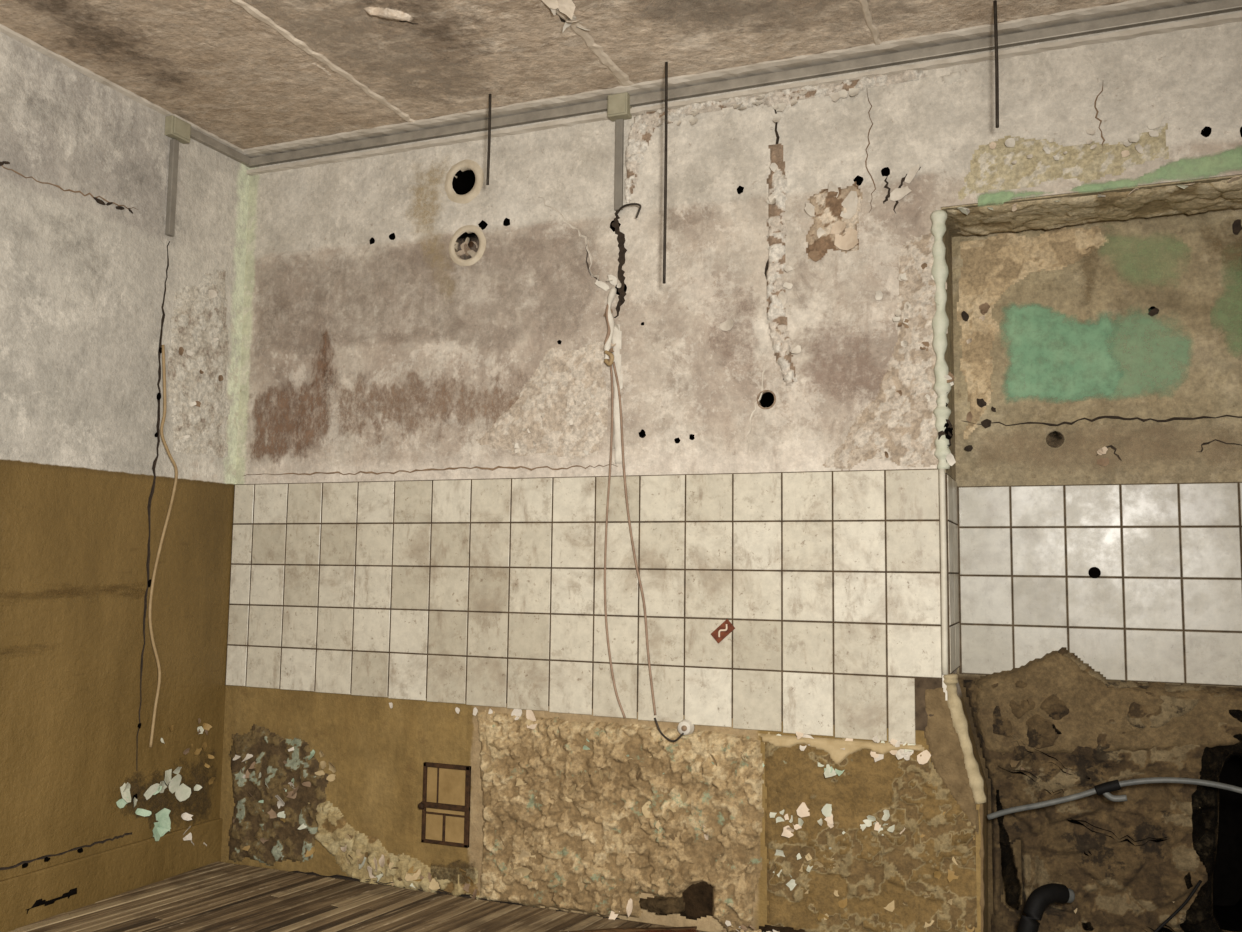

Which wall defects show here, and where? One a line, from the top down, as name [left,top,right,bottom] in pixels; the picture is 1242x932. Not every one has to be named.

crack [0,161,138,214]
spalling [804,181,862,262]
peeling [930,112,1242,470]
damp [253,332,519,461]
crack [964,415,1242,466]
crack [133,241,170,802]
crack [0,832,132,870]
flaking render [290,647,1242,932]